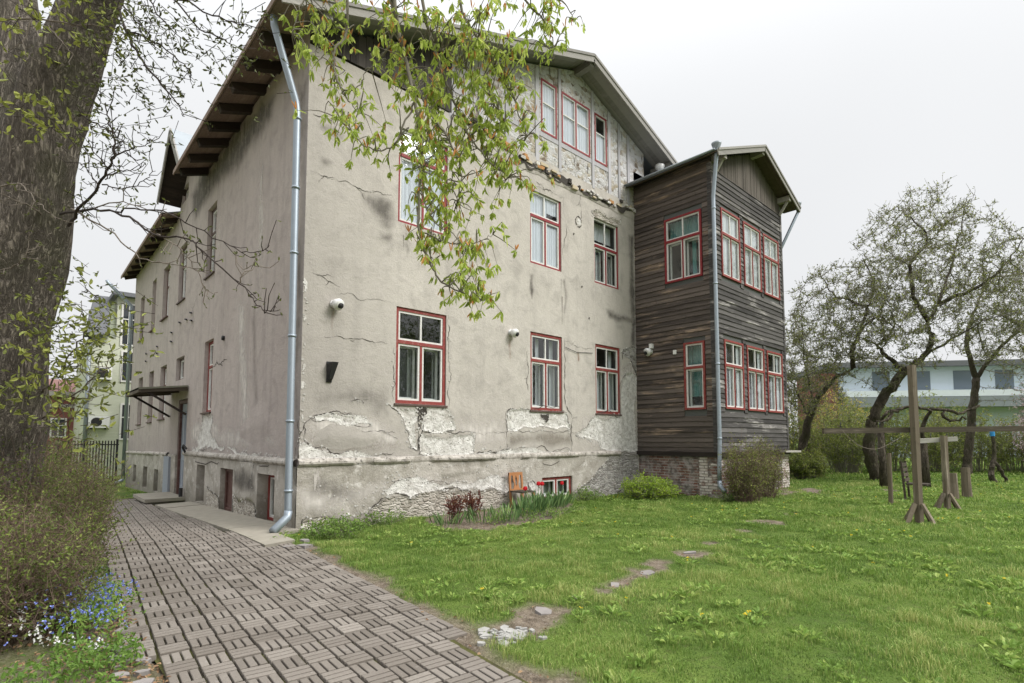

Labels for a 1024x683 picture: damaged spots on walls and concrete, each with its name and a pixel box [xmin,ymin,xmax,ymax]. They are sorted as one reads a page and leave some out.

leakage [373,201,388,219]
flaking render [452,113,636,226]
spalling [192,410,280,467]
spalling [301,344,373,427]
spalling [297,403,572,532]
crack [294,336,600,458]
spalling [506,345,639,497]